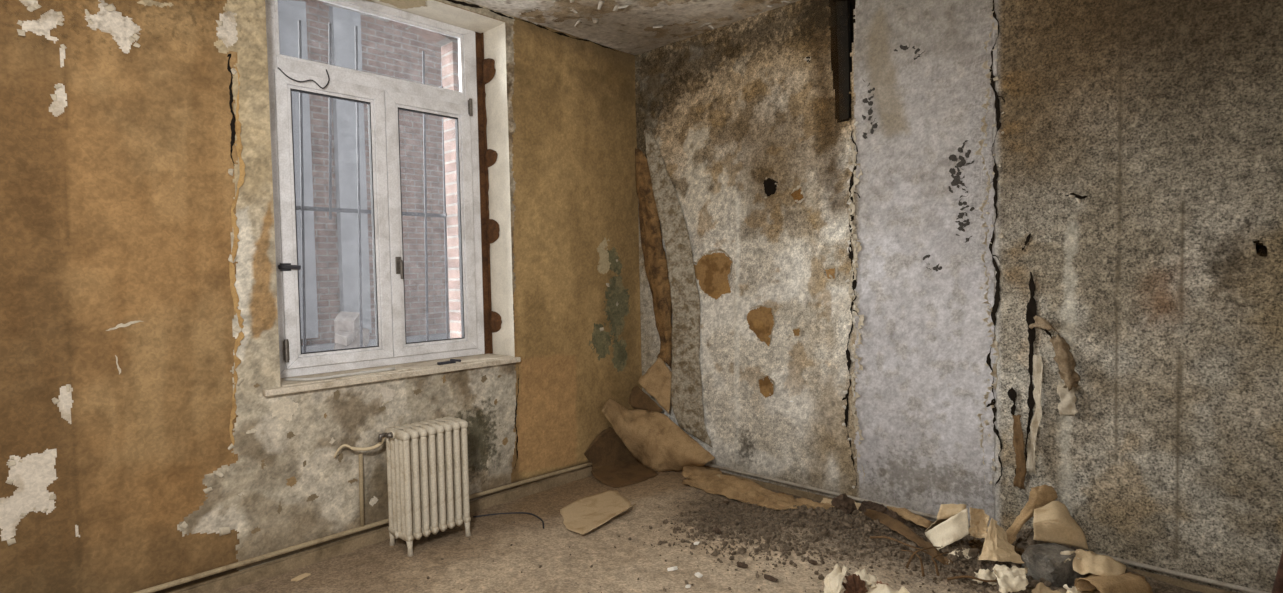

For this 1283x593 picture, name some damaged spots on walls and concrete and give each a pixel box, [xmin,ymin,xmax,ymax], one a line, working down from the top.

peeling [17,0,67,67]
peeling [85,0,142,54]
peeling [49,83,67,117]
crack [227,54,236,163]
flaking render [177,0,734,571]
water stain [588,238,630,372]
peeling [747,305,775,346]
flaking render [825,0,998,528]
crack [974,0,1052,500]
peeling [759,375,775,398]
water stain [458,399,500,475]
peeling [0,449,58,546]